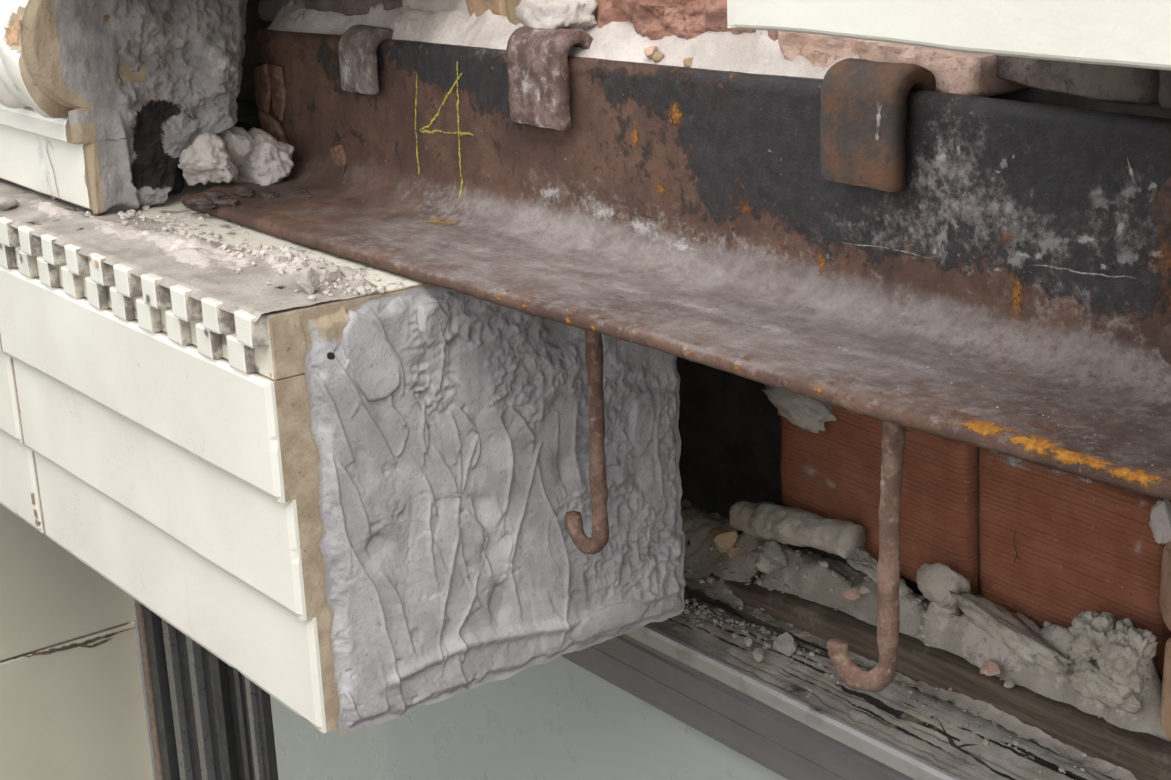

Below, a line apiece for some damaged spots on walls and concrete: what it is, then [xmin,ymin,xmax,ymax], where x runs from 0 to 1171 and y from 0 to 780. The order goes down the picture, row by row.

spalling [5,16,22,45]
spalling [596,0,778,41]
corrosion [254,63,289,144]
corrosion [668,104,682,128]
water stain [585,200,614,217]
water stain [631,220,658,239]
corrosion [950,414,1162,489]